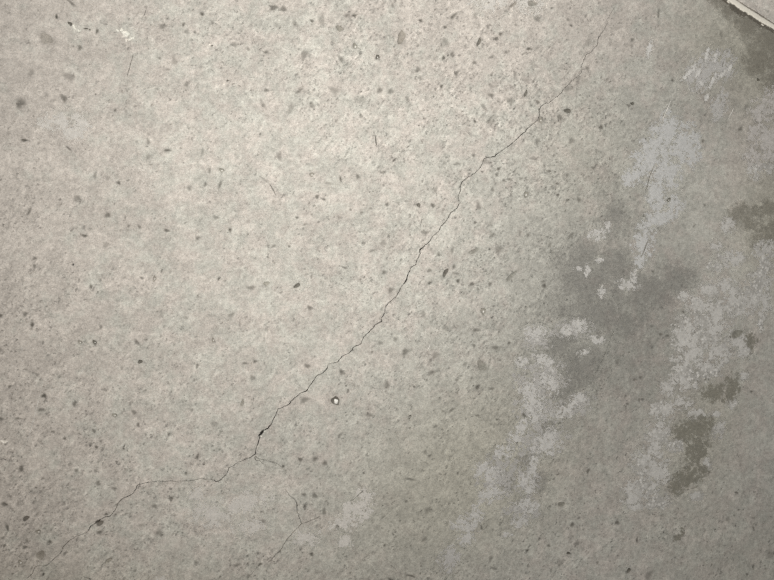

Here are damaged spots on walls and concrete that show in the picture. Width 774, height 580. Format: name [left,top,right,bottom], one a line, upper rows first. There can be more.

leakage [679,46,739,123]
leakage [716,0,774,181]
crack [31,8,614,575]
leakage [435,317,606,576]
leakage [573,257,604,278]
leakage [614,108,703,291]
leakage [619,216,774,512]